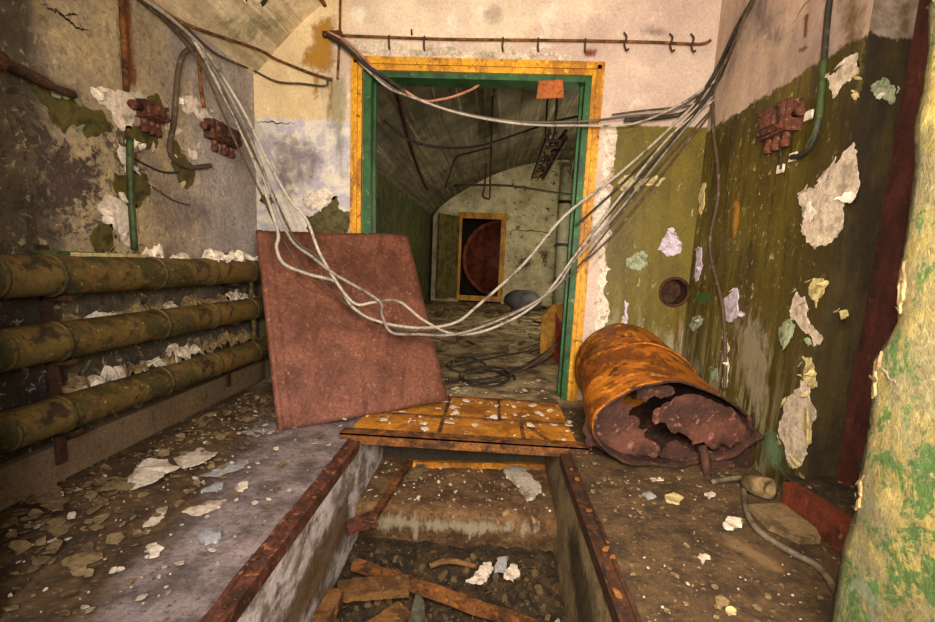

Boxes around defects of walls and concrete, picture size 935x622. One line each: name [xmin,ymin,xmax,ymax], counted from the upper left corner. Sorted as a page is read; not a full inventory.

peeling [31,86,168,253]
peeling [161,118,204,190]
peeling [179,96,213,122]
peeling [592,129,666,332]
peeling [658,227,682,256]
peeling [694,246,703,281]
peeling [798,142,860,249]
peeling [825,41,900,105]
peeling [709,288,745,388]
peeling [777,278,829,469]